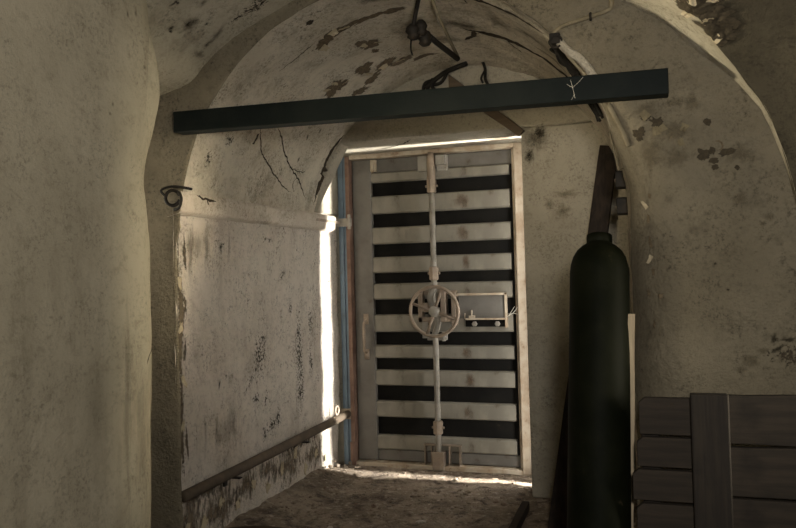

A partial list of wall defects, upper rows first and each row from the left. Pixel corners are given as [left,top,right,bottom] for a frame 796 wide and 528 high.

flaking render [675,0,745,47]
crack [252,129,306,200]
water stain [289,298,313,408]